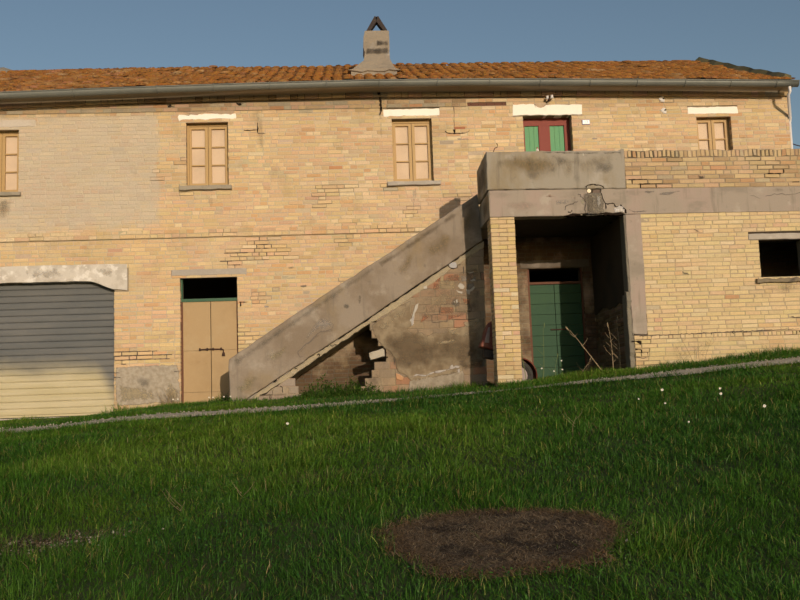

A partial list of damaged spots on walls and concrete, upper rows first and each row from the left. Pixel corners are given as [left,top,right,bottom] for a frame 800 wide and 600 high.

spalling [564,184,627,218]
peeling [448,262,476,294]
peeling [372,301,485,391]